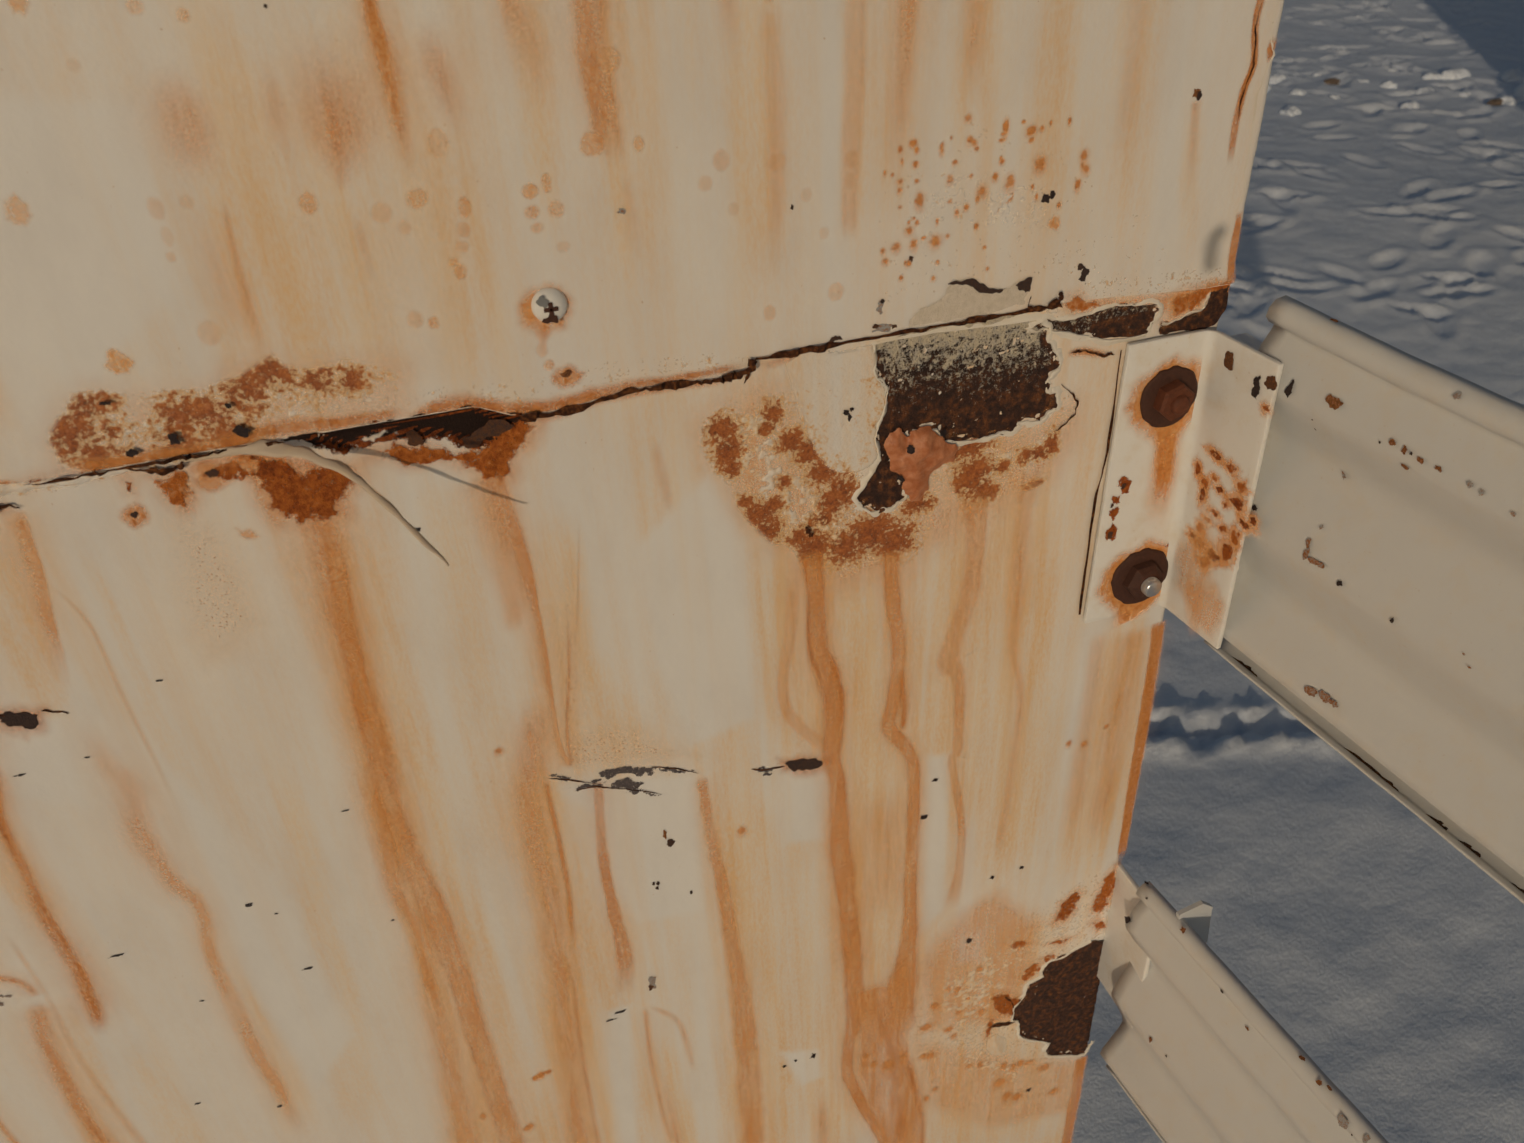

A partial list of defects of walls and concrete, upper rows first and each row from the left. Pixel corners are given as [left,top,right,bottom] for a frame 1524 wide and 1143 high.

crack [0,449,227,509]
rust [81,367,727,763]
crack [265,292,1064,455]
spalling [774,277,1230,517]
rust [1100,476,1169,624]
rust [1129,360,1200,497]
rust [1188,446,1258,571]
peeling [0,709,69,729]
peeling [751,758,823,772]
rust [1118,623,1164,854]
rust [1056,871,1115,930]
spalling [989,939,1103,1058]